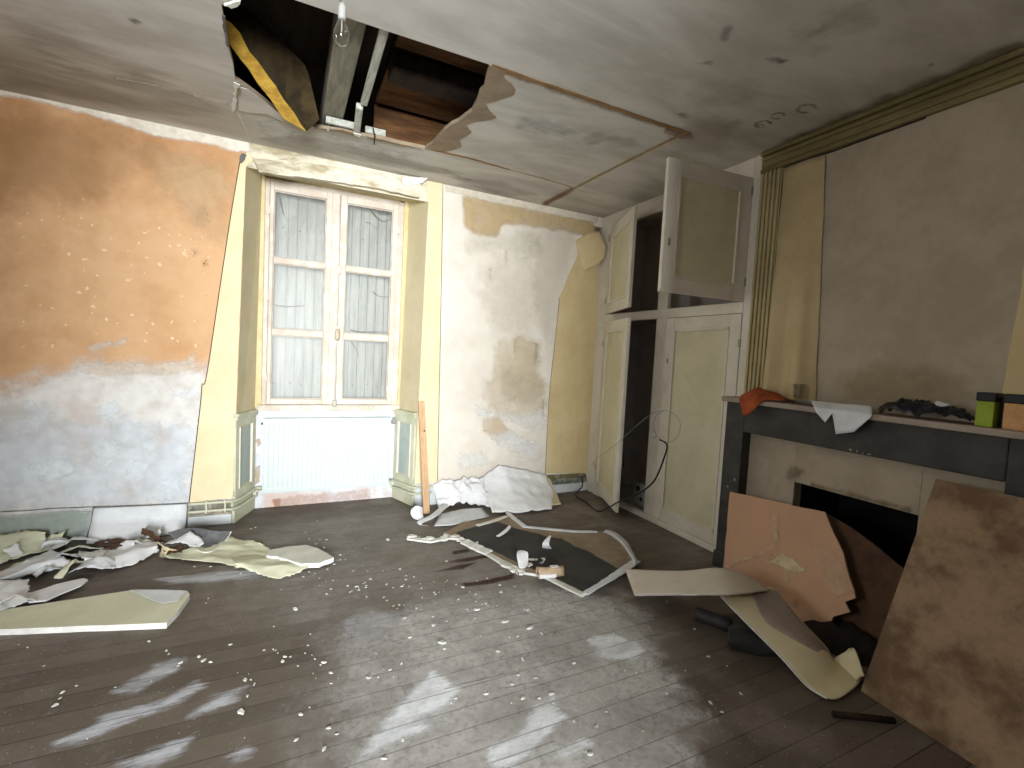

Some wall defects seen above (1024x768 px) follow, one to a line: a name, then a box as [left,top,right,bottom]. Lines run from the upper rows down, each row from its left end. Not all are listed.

peeling [222,0,241,47]
peeling [231,82,240,112]
peeling [314,125,423,149]
peeling [445,184,597,222]
damp [0,424,192,505]